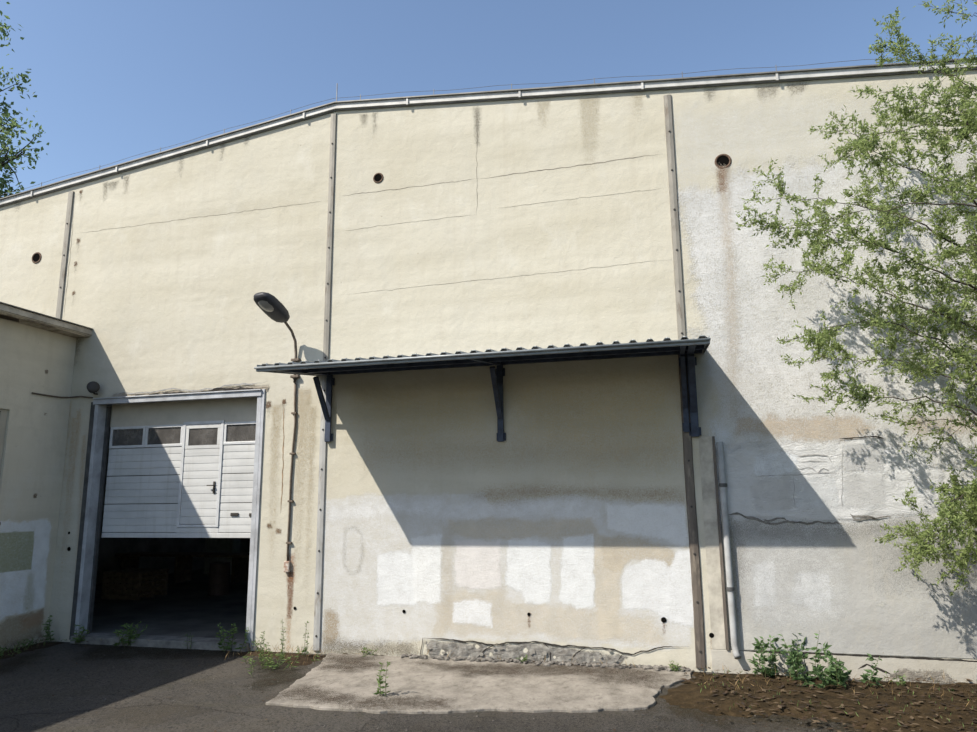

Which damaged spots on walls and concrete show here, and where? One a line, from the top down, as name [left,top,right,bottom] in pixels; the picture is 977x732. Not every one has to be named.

crack [64,105,658,311]
corrosion [713,164,745,421]
corrosion [266,387,318,650]
crack [728,512,892,525]
crack [420,638,688,660]